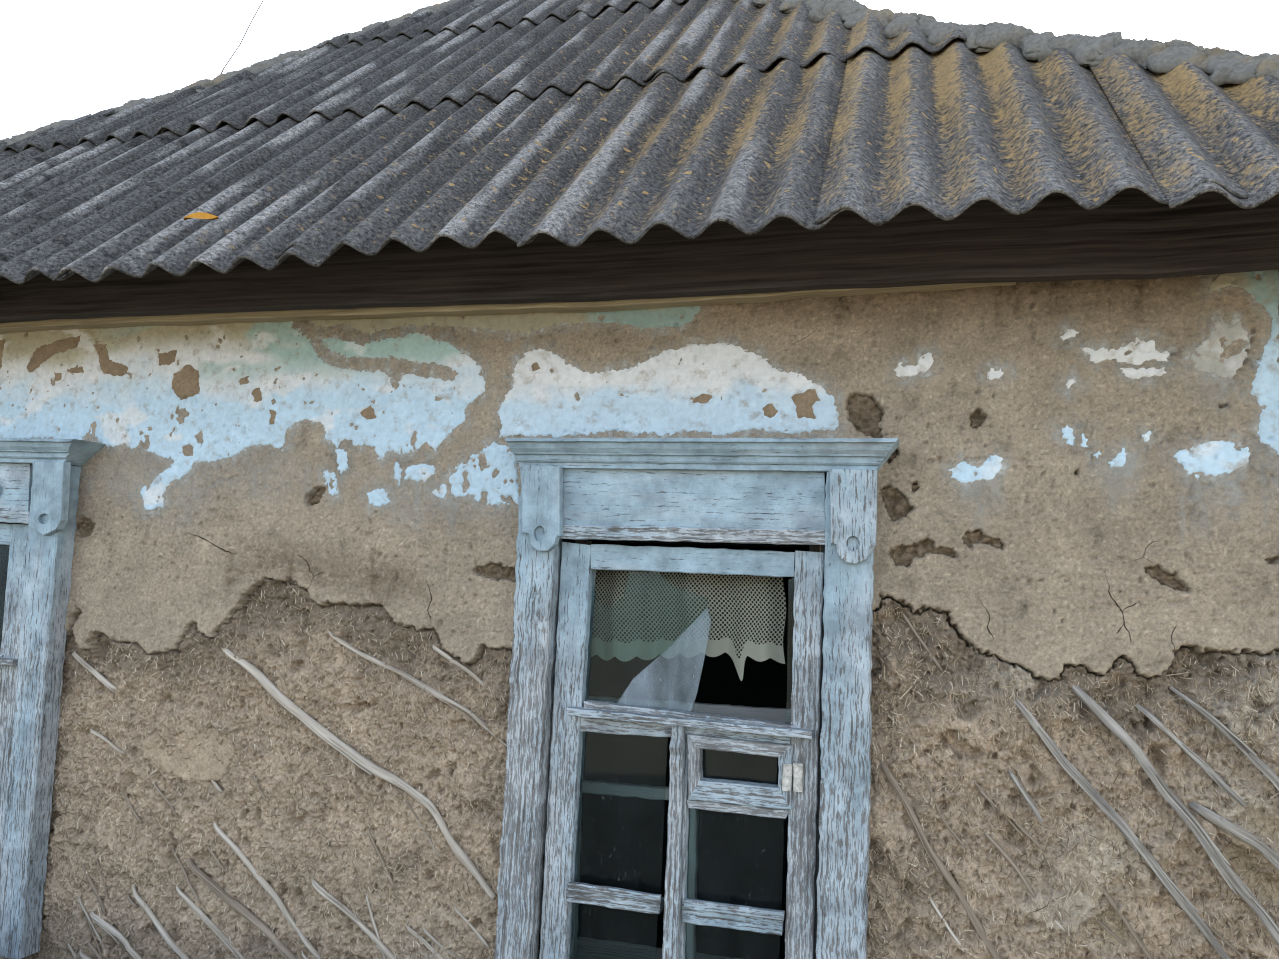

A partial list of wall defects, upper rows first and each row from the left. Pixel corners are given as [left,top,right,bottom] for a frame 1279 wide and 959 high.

peeling [0,306,884,515]
peeling [1055,270,1279,486]
crack [1104,540,1159,641]
spalling [1144,566,1188,592]
spalling [0,578,512,959]
spalling [866,598,1279,959]